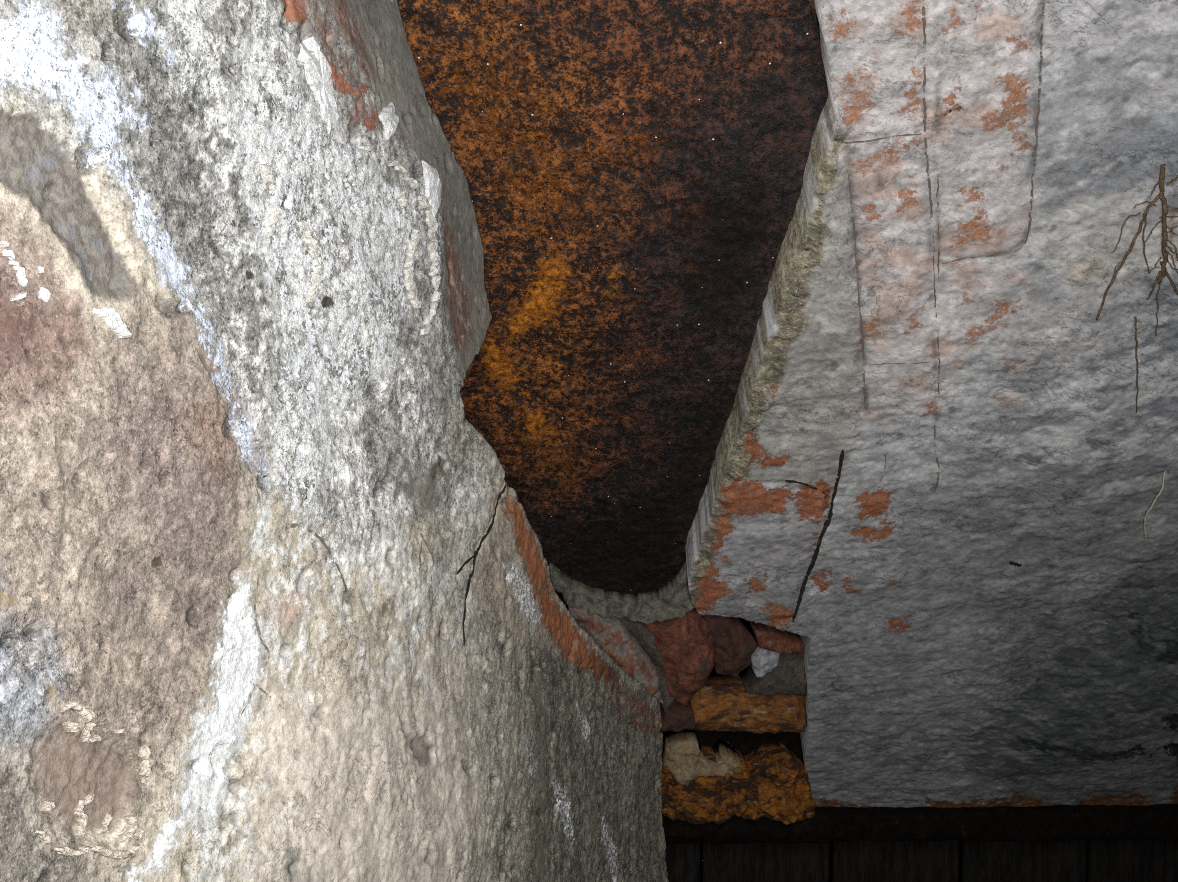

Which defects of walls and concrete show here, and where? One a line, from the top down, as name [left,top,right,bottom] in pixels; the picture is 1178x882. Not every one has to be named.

rust [438,38,592,240]
peeling [843,68,876,125]
peeling [981,73,1036,154]
peeling [951,187,1001,248]
rust [498,253,573,341]
rust [482,338,521,389]
crack [413,479,507,646]
flaking render [693,430,835,631]
crack [785,449,844,622]
flaking render [849,489,896,542]
damp [953,566,1178,782]
rust [661,742,875,825]